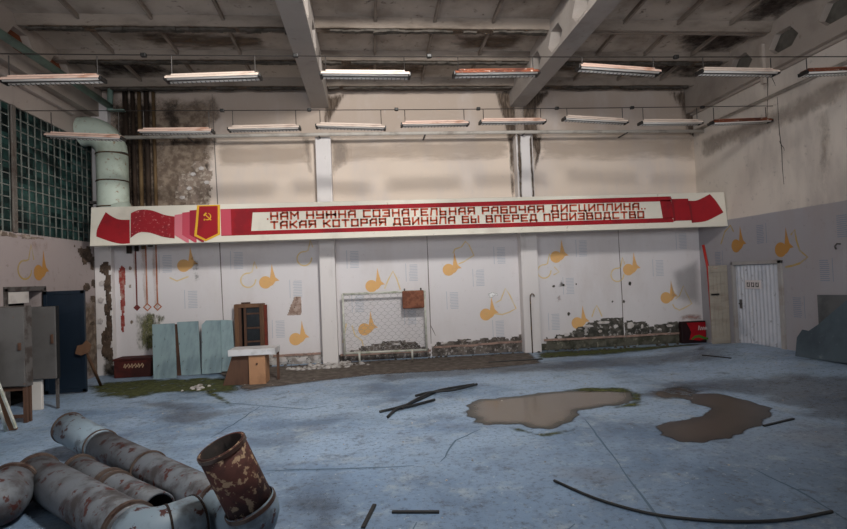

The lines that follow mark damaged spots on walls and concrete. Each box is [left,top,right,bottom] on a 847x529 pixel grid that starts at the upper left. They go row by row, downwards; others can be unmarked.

leakage [67,59,297,76]
mould [683,35,744,51]
mould [750,0,796,19]
leakage [99,86,305,206]
leakage [323,60,723,197]
crack [767,78,784,182]
flaking render [74,245,133,360]
flaking render [541,317,679,351]
crack [585,419,667,529]